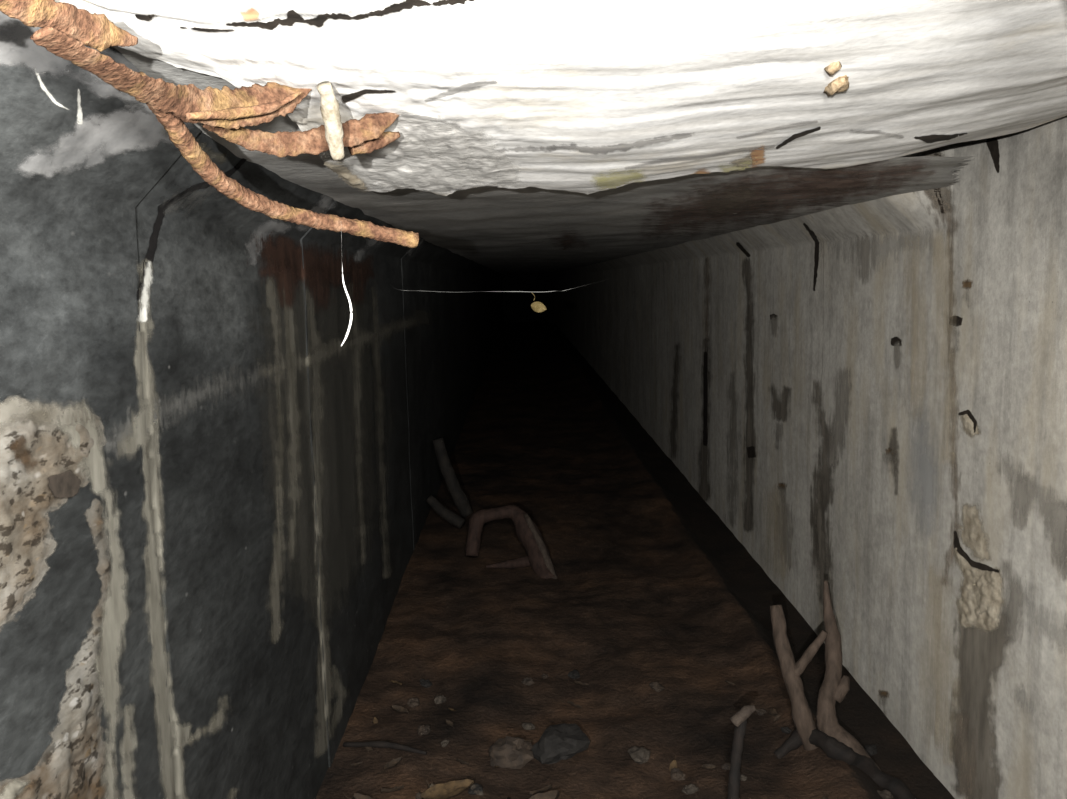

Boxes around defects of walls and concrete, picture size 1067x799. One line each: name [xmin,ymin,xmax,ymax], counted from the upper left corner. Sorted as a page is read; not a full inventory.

leakage [34,68,83,125]
crack [135,13,155,21]
crack [180,0,474,32]
crack [137,158,247,300]
spalling [0,397,137,799]
leakage [118,260,227,799]
leakage [262,278,431,757]
leakage [699,259,710,501]
leakage [727,242,756,532]
leakage [811,370,851,609]
leakage [950,564,1033,799]
leakage [999,464,1067,579]